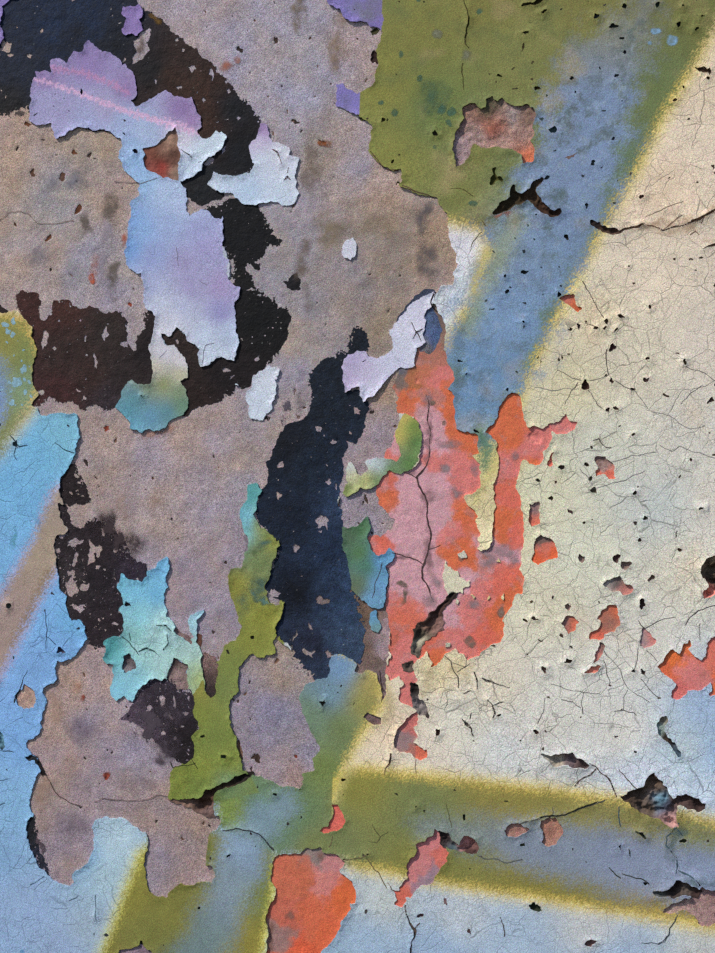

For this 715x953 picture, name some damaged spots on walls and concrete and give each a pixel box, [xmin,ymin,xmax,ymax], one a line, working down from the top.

peeling [452,96,557,167]
spalling [490,167,562,217]
crack [614,201,715,249]
crack [411,292,438,340]
peeling [0,0,458,898]
crack [372,395,440,602]
crack [536,349,715,490]
crack [444,655,510,736]
crack [537,605,715,724]
crack [520,763,701,886]
spalling [621,773,706,828]
crack [329,825,420,953]